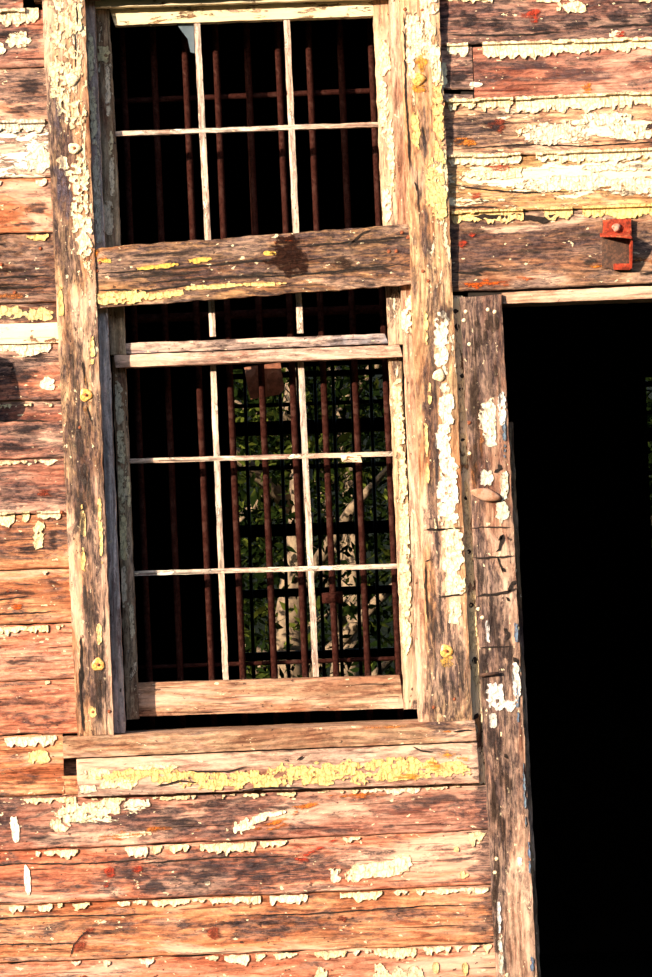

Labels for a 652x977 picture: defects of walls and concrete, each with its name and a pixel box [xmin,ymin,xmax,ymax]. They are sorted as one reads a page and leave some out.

peeling [0,0,115,264]
peeling [377,39,395,222]
peeling [403,0,652,224]
peeling [96,282,287,305]
corrosion [263,235,311,278]
peeling [424,308,461,367]
peeling [424,381,521,728]
peeling [24,756,486,832]
peeling [113,810,287,858]
peeling [117,894,308,907]
peeling [330,855,413,903]
peeling [314,901,504,977]